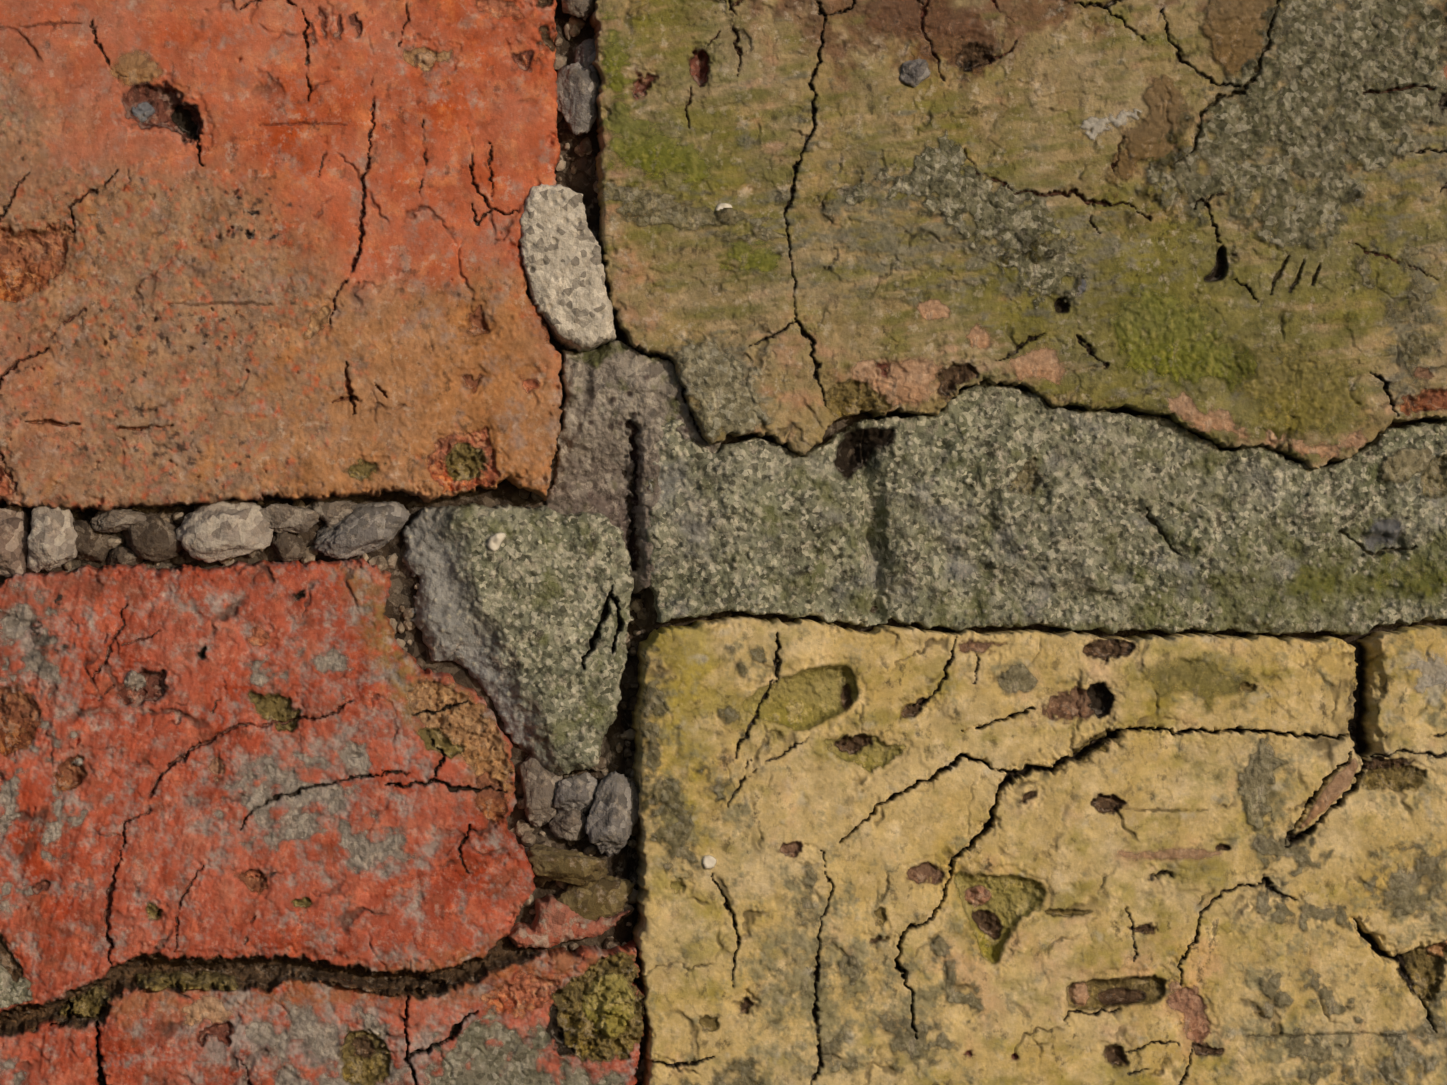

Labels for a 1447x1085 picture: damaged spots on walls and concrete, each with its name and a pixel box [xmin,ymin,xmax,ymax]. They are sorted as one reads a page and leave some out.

spalling [111,51,202,143]
crack [1074,0,1279,165]
crack [329,81,375,324]
crack [469,143,518,226]
crack [749,0,855,406]
crack [964,138,1151,234]
crack [581,420,640,669]
crack [0,681,541,1085]
crack [711,873,740,987]
crack [810,637,1447,1085]
spalling [1285,756,1426,844]
spalling [1392,940,1447,1002]